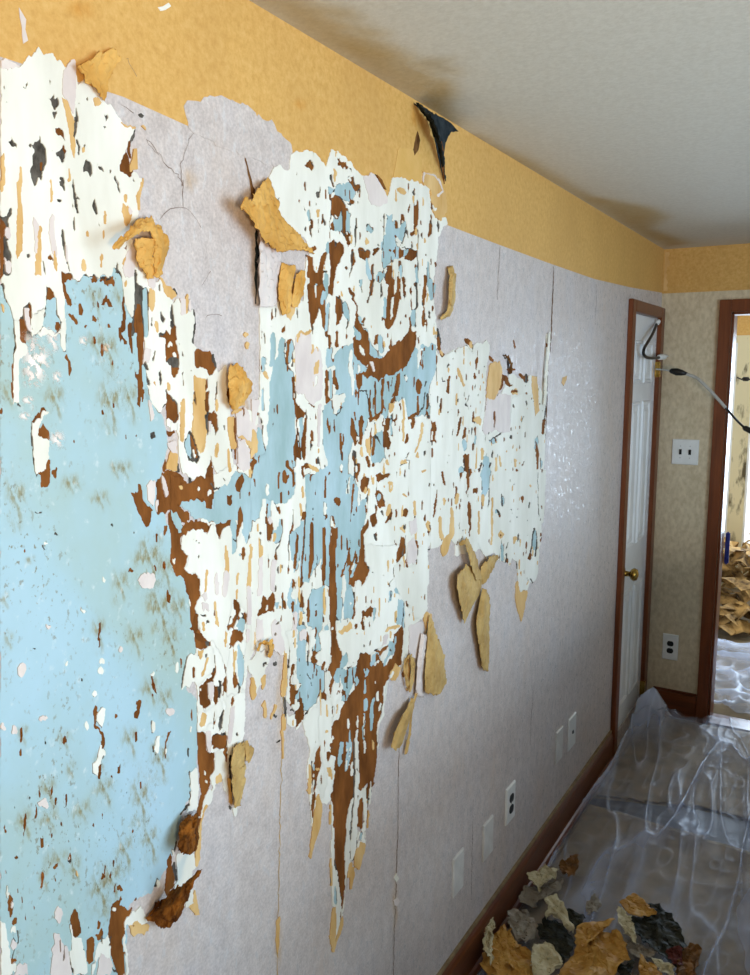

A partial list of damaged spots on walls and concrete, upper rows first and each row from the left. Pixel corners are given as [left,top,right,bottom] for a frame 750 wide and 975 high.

crack [146,138,201,227]
peeling [0,47,549,975]